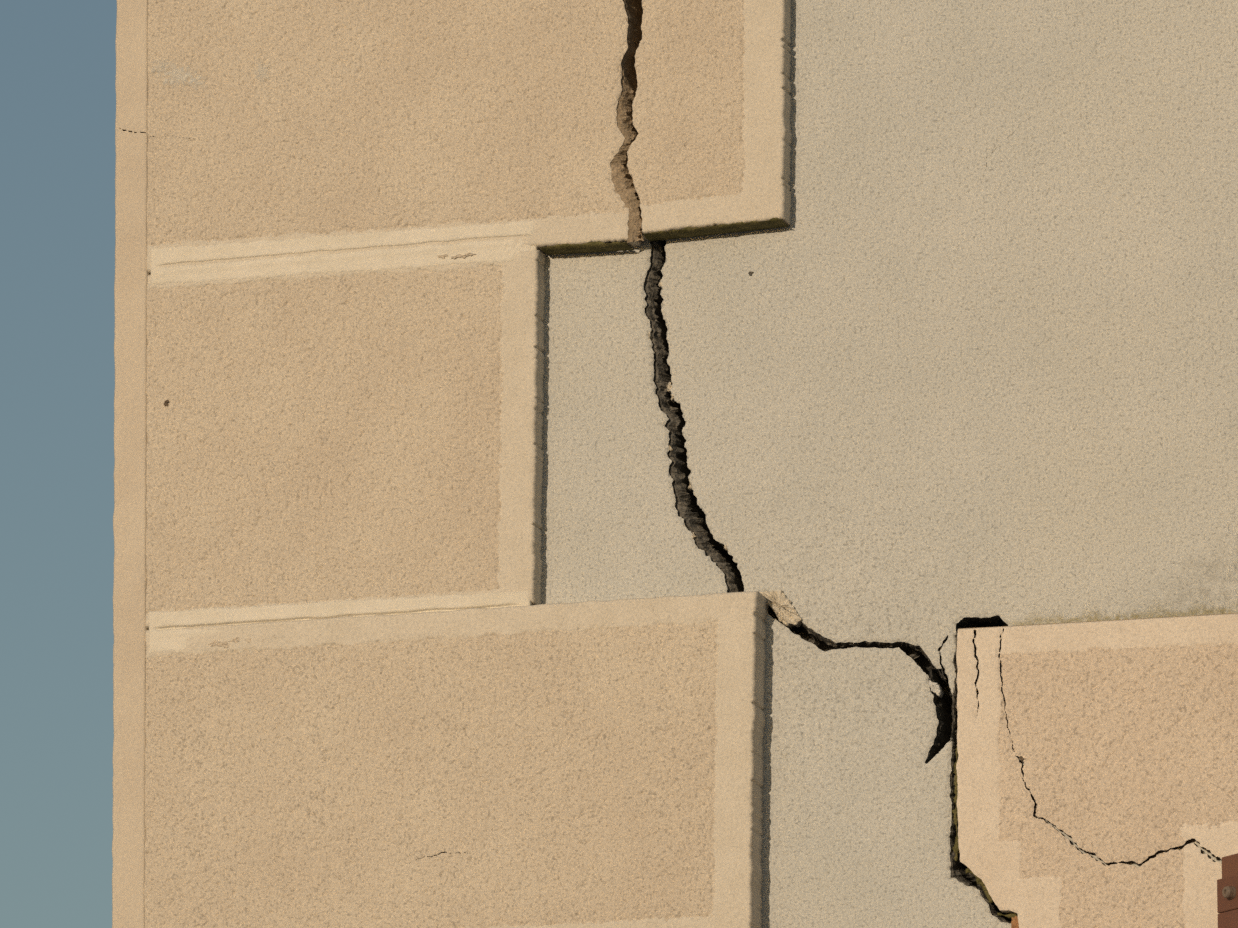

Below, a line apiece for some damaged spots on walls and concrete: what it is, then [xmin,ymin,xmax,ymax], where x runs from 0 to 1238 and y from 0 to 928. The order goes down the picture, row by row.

crack [610,0,1221,923]